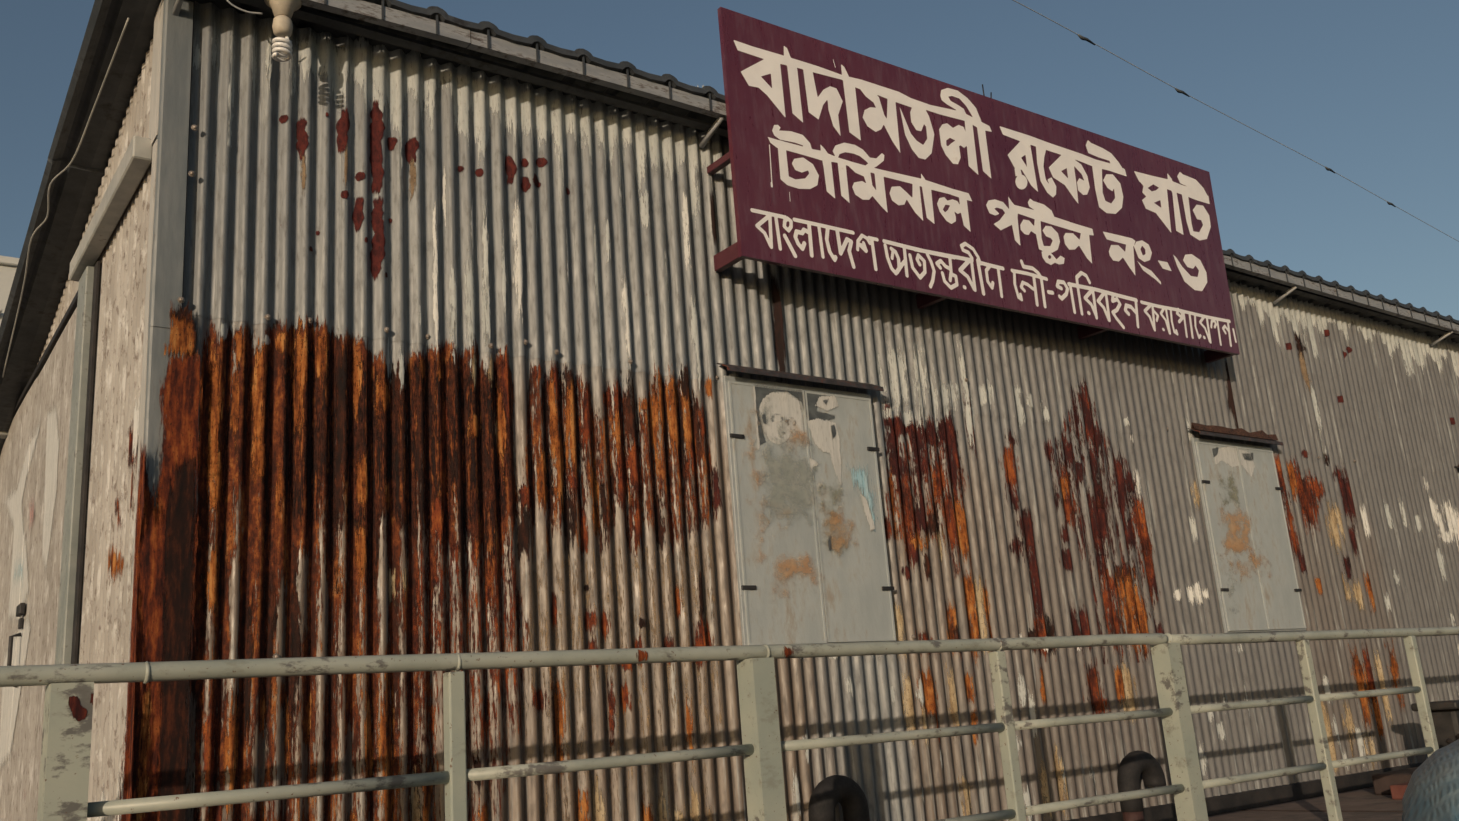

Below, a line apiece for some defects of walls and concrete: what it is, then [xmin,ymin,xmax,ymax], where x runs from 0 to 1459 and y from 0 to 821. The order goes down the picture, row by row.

rust [279,115,309,190]
rust [326,100,419,281]
rust [505,155,548,193]
peeling [1227,279,1459,379]
rust [107,300,733,821]
rust [882,382,992,745]
rust [998,378,1164,725]
rust [1191,331,1392,613]
peeling [1359,505,1371,537]
peeling [1383,476,1459,581]
rust [1321,640,1405,772]